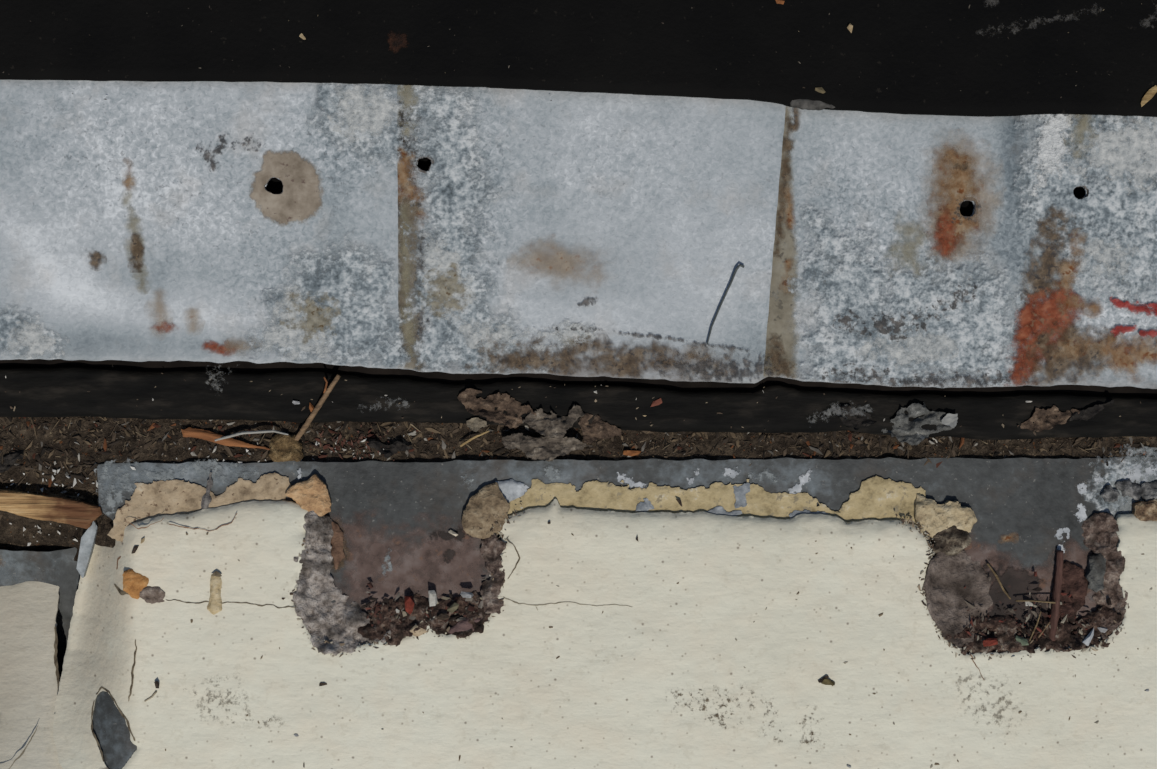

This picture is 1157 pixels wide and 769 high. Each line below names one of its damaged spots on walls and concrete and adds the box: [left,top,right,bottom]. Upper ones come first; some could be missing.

corrosion [196,134,323,225]
corrosion [397,85,426,216]
corrosion [933,145,991,256]
corrosion [1009,208,1157,386]
spalling [107,472,1157,656]